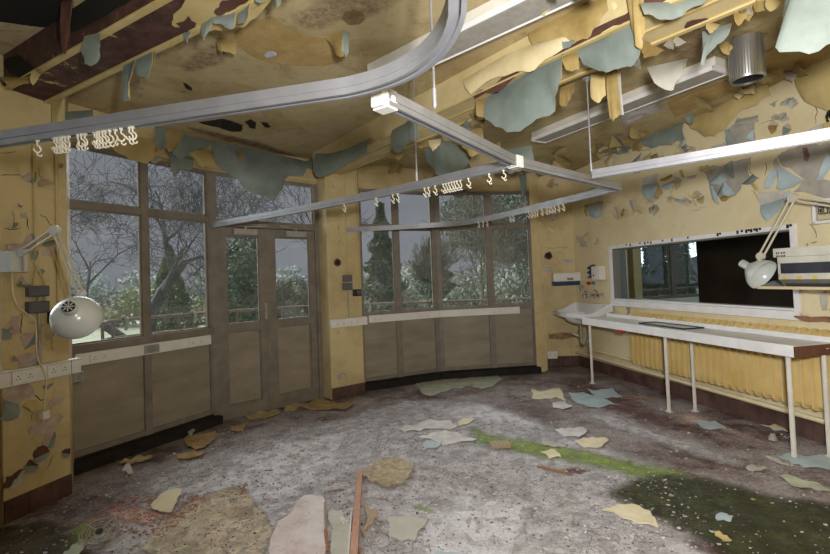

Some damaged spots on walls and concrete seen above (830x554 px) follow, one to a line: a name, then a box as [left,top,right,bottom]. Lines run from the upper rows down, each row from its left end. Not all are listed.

flaking render [0,55,44,88]
flaking render [0,0,74,54]
peeling [81,33,100,66]
peeling [122,52,155,101]
peeling [172,0,281,54]
peeling [51,99,93,122]
peeling [462,0,830,221]
peeling [103,127,372,200]
peeling [389,121,498,178]
peeling [7,203,56,275]
peeling [1,313,54,368]
peeling [0,383,70,490]